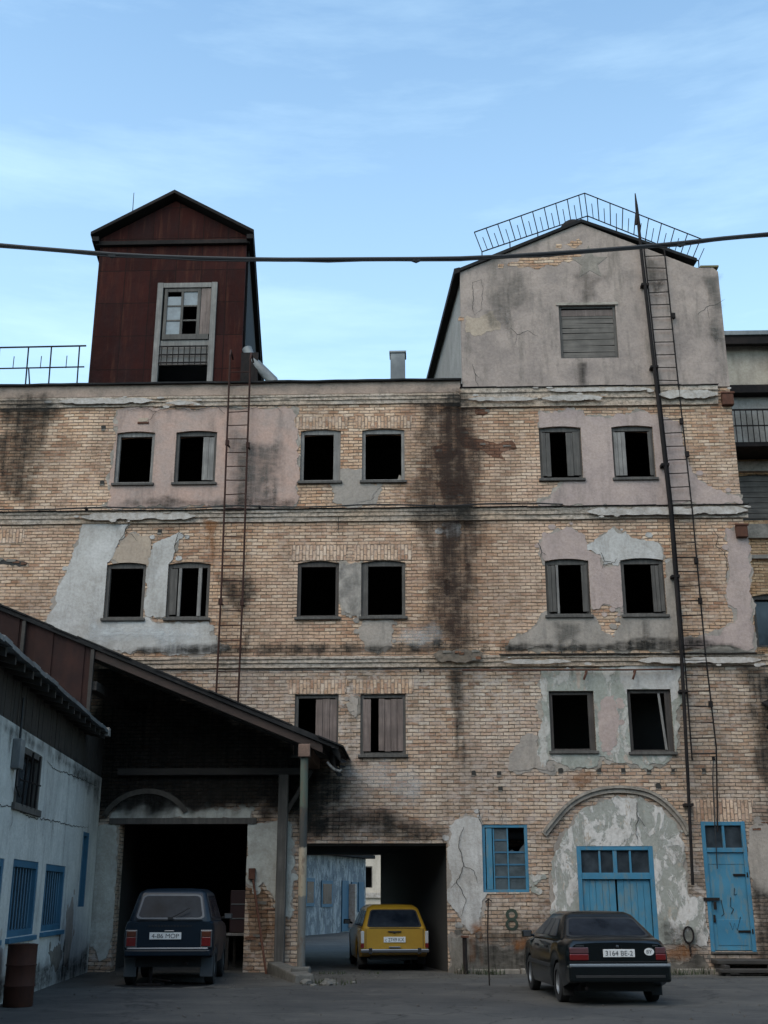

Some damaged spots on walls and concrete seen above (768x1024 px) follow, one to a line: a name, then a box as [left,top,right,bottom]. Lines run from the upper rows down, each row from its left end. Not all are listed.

peeling [498,239,582,269]
water stain [0,393,55,499]
peeling [44,396,301,657]
water stain [91,393,484,655]
water stain [505,625,724,652]
peeling [468,387,766,777]
peeling [89,805,298,962]
crack [451,806,503,916]
peeling [529,795,710,951]